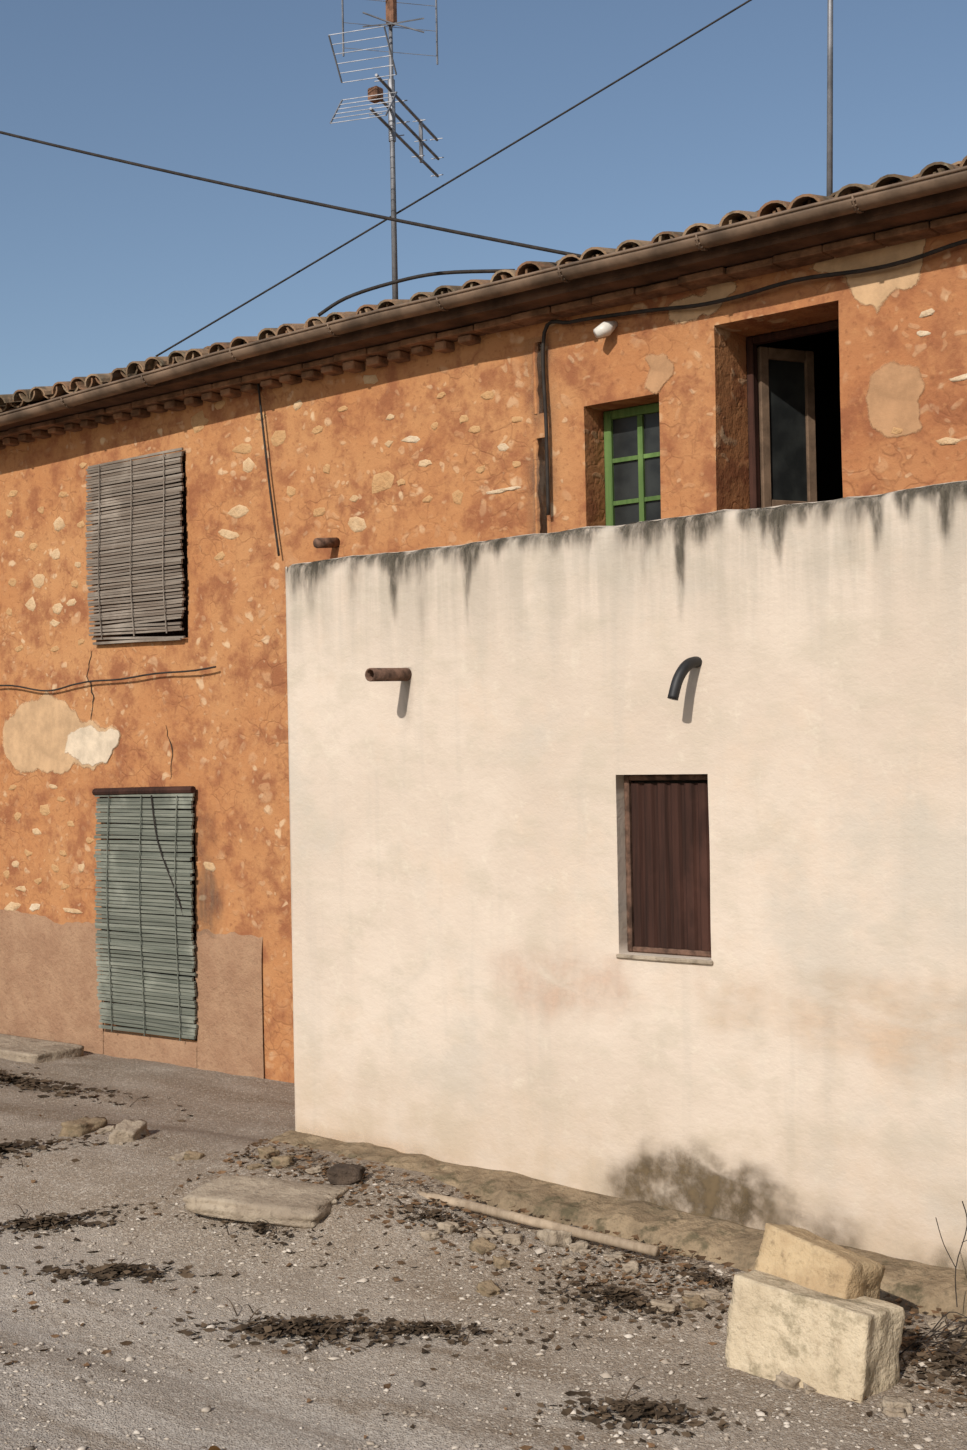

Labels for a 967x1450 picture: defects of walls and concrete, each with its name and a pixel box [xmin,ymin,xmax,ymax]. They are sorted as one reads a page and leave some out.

flaking render [811,238,926,311]
spalling [917,308,935,337]
flaking render [866,362,924,437]
spalling [936,437,960,445]
leakage [622,511,718,578]
leakage [747,501,831,544]
leakage [859,481,967,532]
flaking render [3,692,120,912]